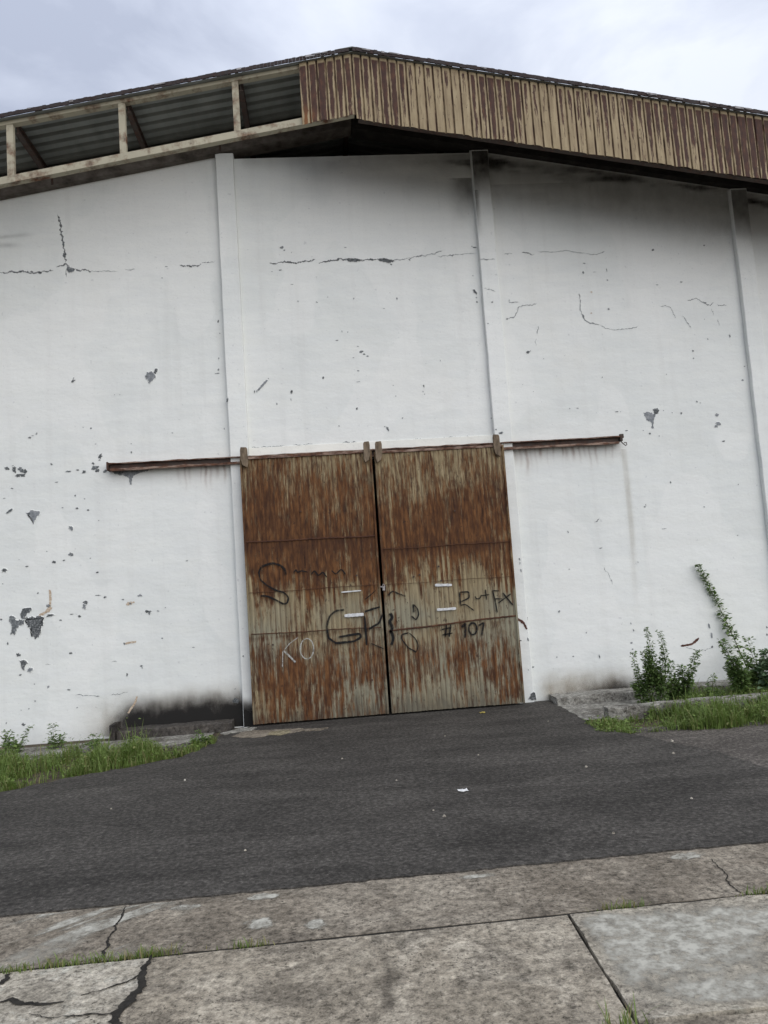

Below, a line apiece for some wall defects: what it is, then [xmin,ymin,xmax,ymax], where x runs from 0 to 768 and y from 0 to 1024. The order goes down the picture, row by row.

crack [0,216,133,276]
crack [270,250,605,343]
crack [579,295,637,330]
crack [660,298,723,327]
peeling [144,368,158,385]
peeling [643,408,682,436]
spalling [0,590,106,688]